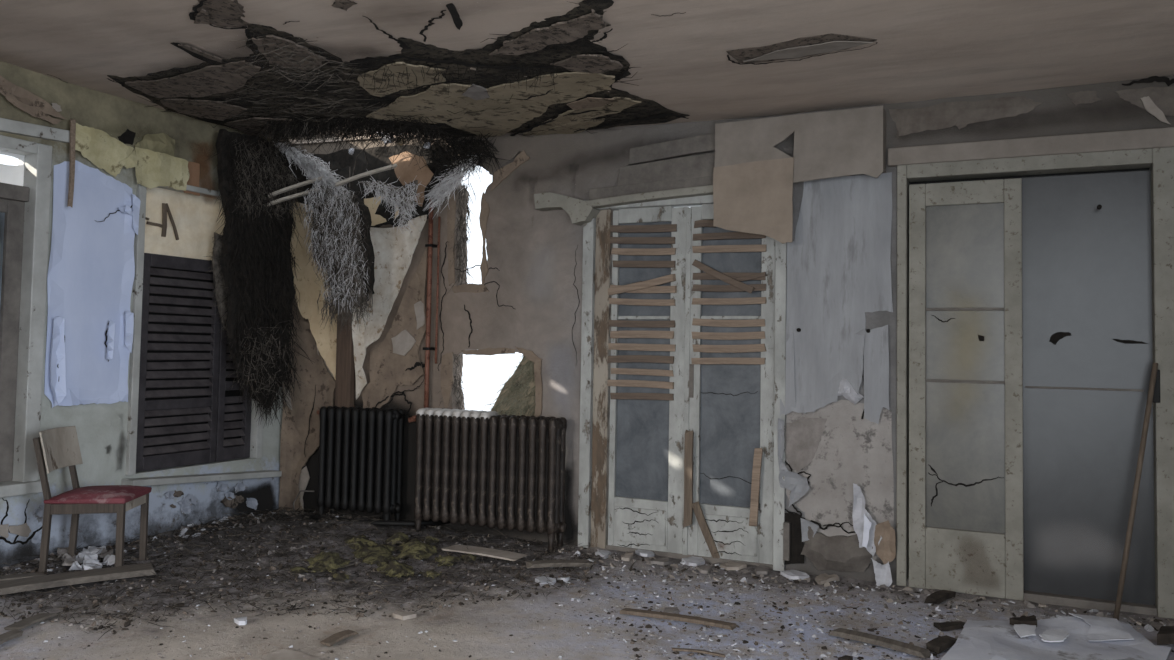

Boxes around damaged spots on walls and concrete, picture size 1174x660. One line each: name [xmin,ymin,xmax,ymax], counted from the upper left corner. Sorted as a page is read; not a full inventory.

crack [332,0,463,49]
spalling [107,0,690,293]
peeling [889,96,1043,138]
peeling [1115,76,1174,124]
peeling [360,247,428,416]
peeling [279,303,336,512]
spalling [441,346,543,417]
crack [0,498,42,545]
spalling [557,400,1174,633]
crack [928,464,1004,506]